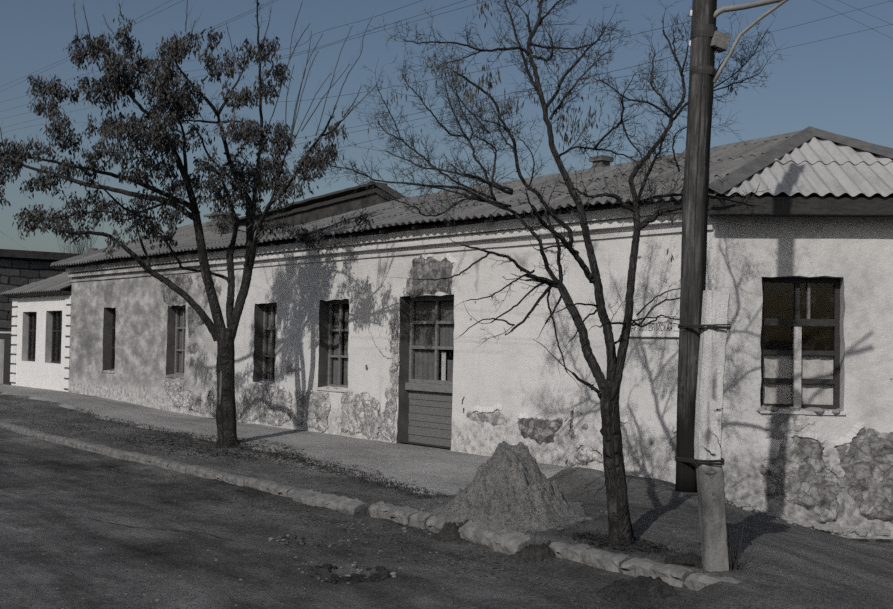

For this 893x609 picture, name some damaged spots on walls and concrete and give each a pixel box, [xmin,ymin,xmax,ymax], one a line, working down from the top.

peeling [403,252,458,298]
spalling [163,378,217,417]
spalling [239,382,330,432]
spalling [341,316,399,443]
spalling [467,401,604,467]
spalling [665,425,677,460]
spalling [759,414,893,523]